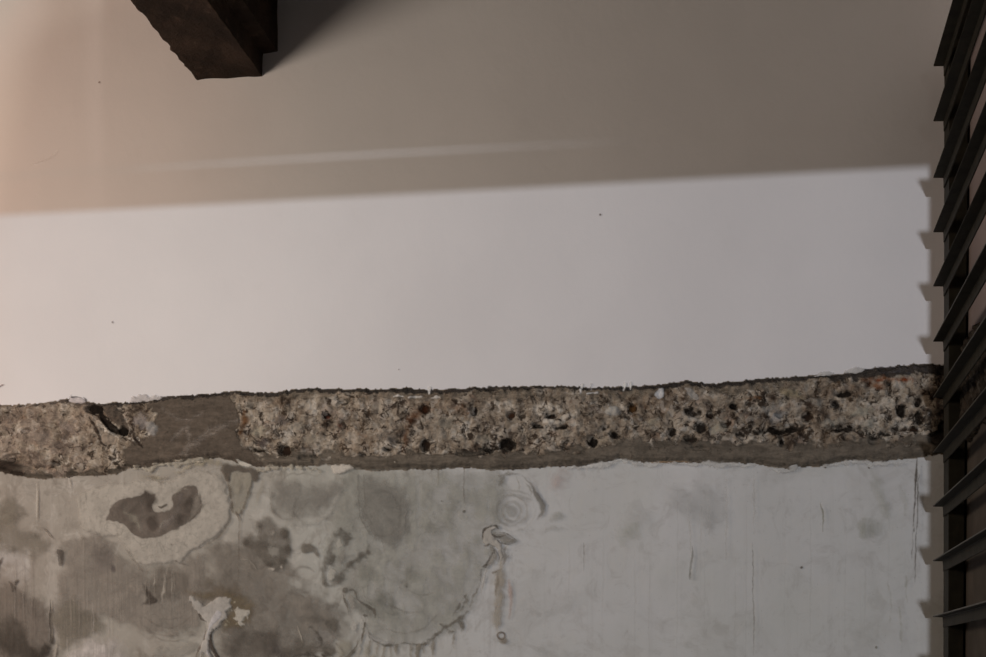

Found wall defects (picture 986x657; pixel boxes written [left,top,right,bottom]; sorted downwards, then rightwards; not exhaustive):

spalling [0,363,944,480]
water stain [221,463,259,519]
water stain [532,486,545,516]
water stain [0,473,508,657]